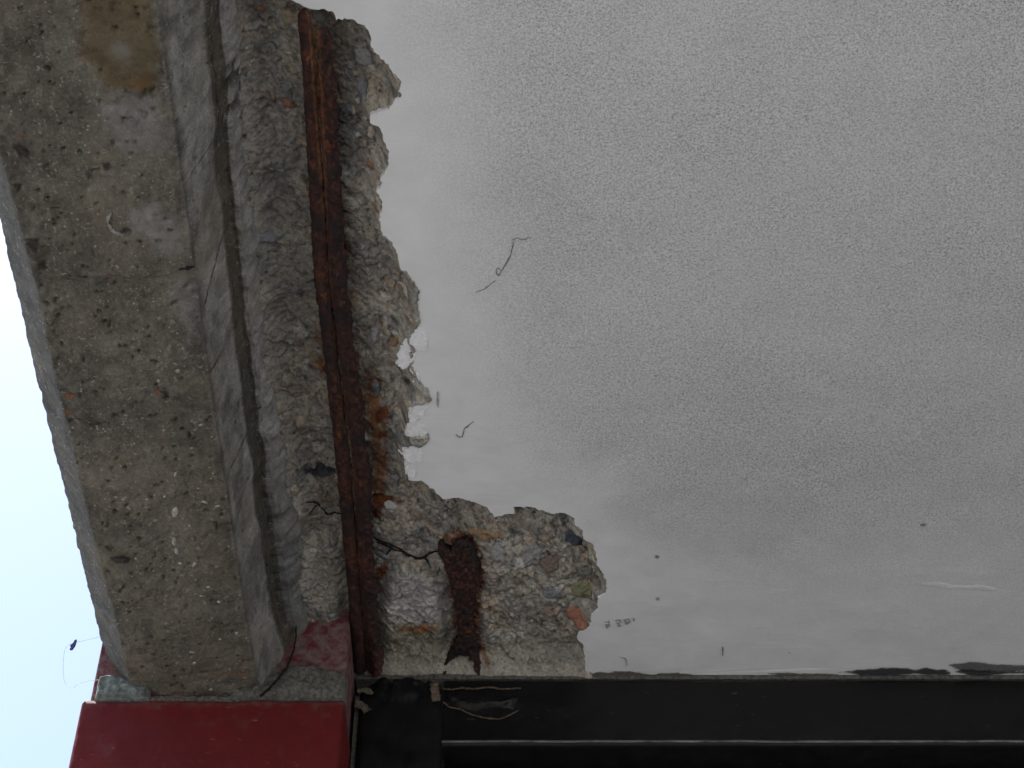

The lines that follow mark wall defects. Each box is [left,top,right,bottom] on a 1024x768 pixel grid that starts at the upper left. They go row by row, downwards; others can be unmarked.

water stain [80,0,159,87]
corrosion [297,8,394,678]
spalling [235,0,694,680]
crack [374,537,438,569]
corrosion [438,528,489,675]